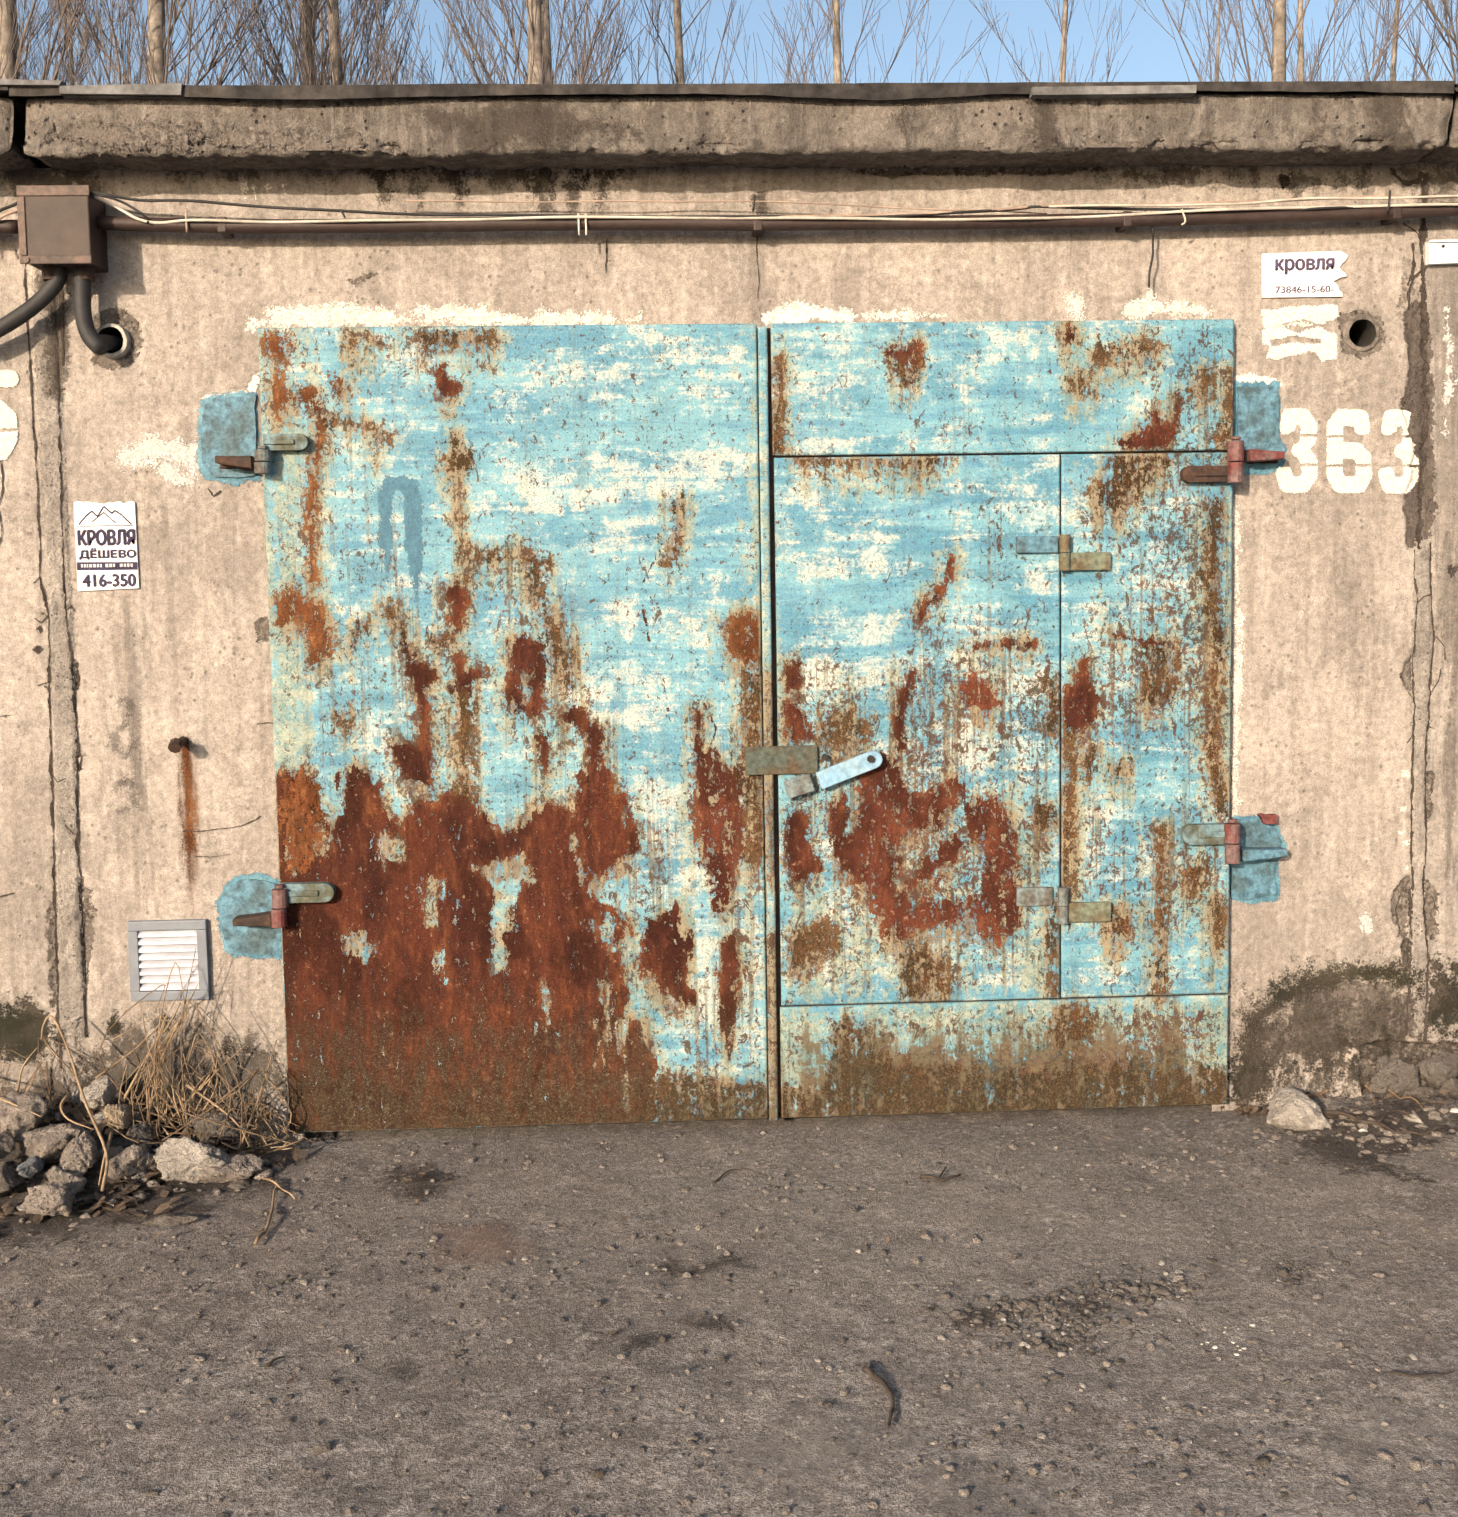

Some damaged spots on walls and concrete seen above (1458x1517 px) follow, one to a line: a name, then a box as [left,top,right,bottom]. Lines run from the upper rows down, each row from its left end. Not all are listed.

crack [0,264,89,1069]
corrosion [181,737,198,883]
corrosion [259,323,1232,1132]
water stain [1221,945,1458,1110]
crack [1390,168,1446,1044]